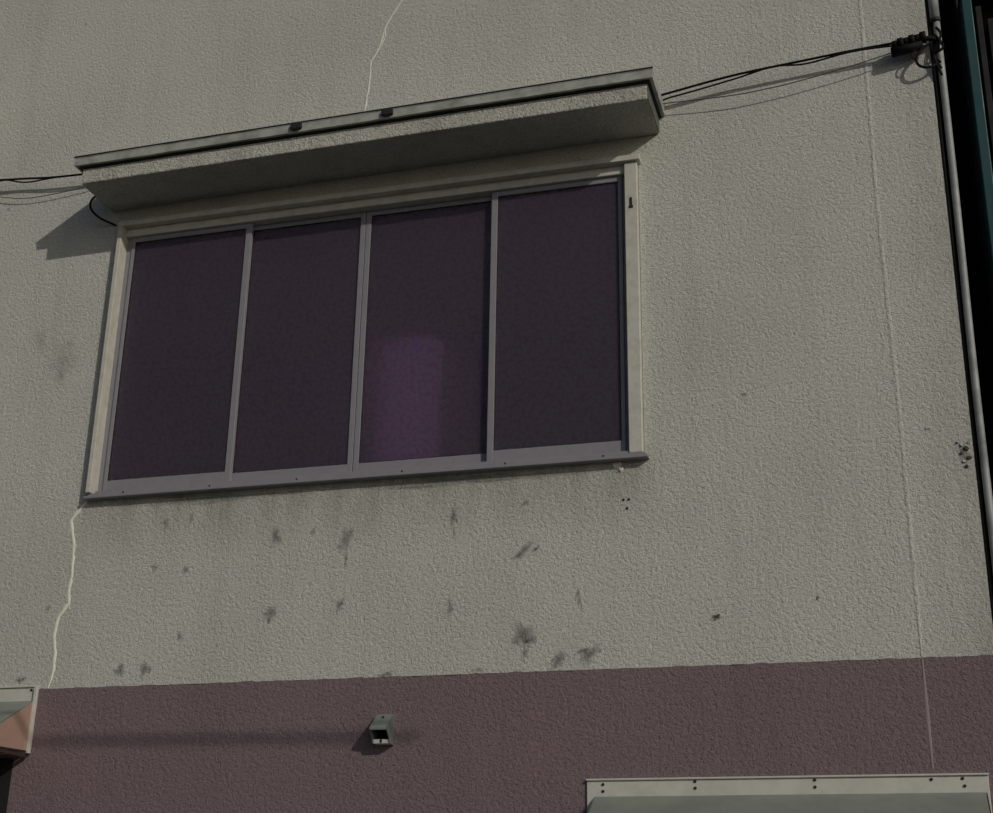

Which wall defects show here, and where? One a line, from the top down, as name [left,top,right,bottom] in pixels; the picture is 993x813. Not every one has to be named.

crack [364,0,403,111]
crack [48,500,88,688]